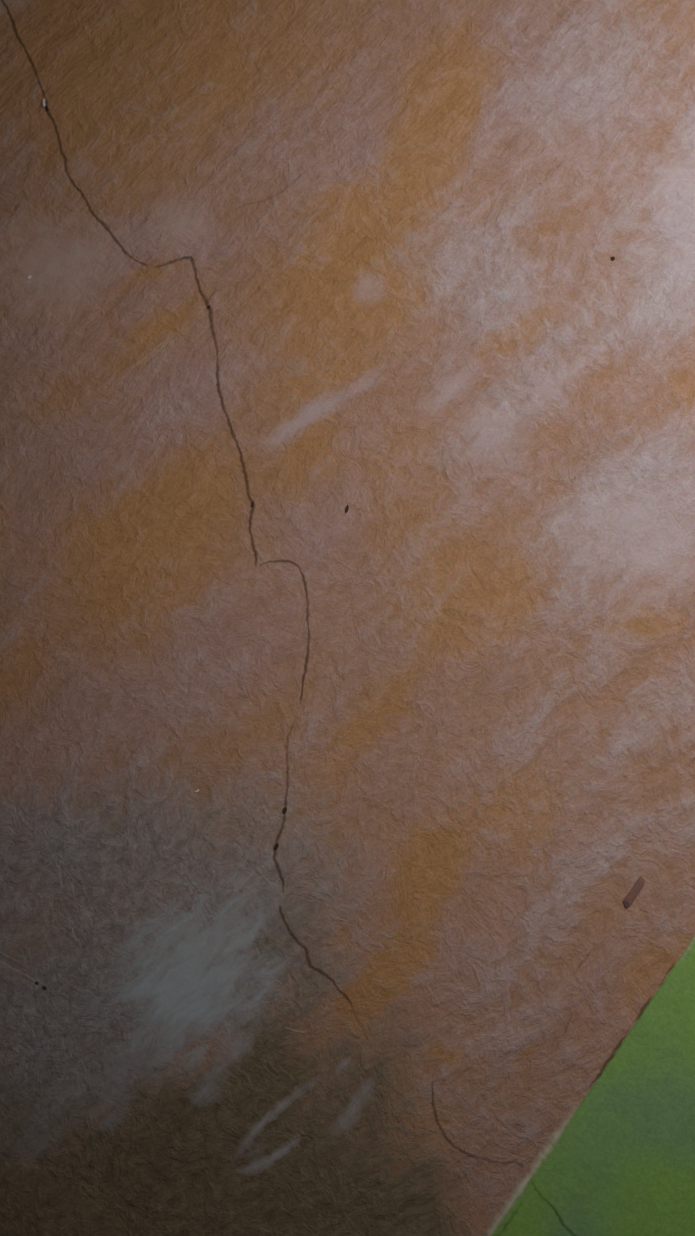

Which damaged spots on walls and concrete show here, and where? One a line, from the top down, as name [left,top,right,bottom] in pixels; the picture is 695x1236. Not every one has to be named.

crack [2,0,119,243]
crack [184,257,214,335]
crack [217,370,257,561]
crack [274,799,349,1000]